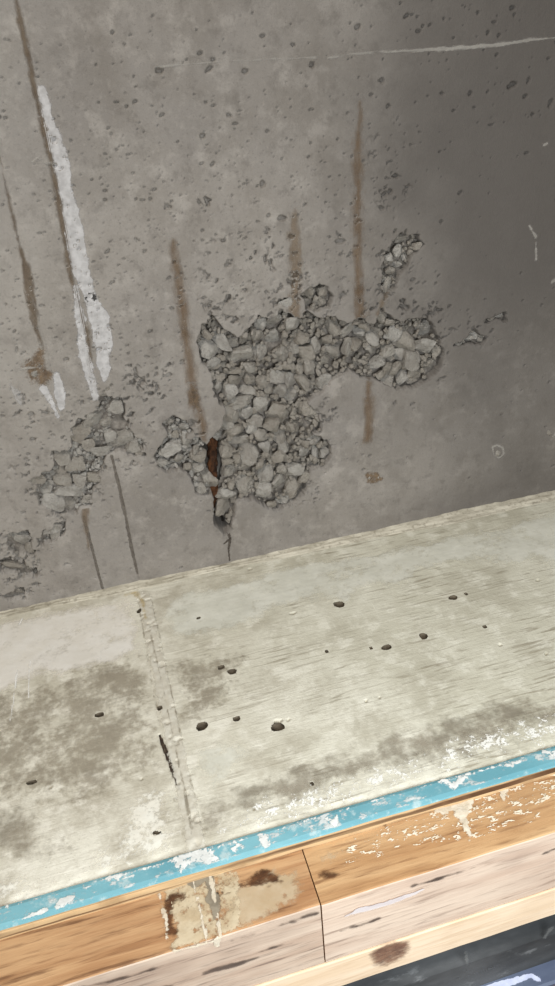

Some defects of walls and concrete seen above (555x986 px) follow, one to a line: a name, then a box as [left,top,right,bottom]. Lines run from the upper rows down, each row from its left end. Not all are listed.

efflorescence [37,85,113,400]
efflorescence [39,372,66,418]
corrosion [172,242,205,435]
spalling [206,437,218,513]
efflorescence [93,791,181,869]
damp [219,713,555,834]